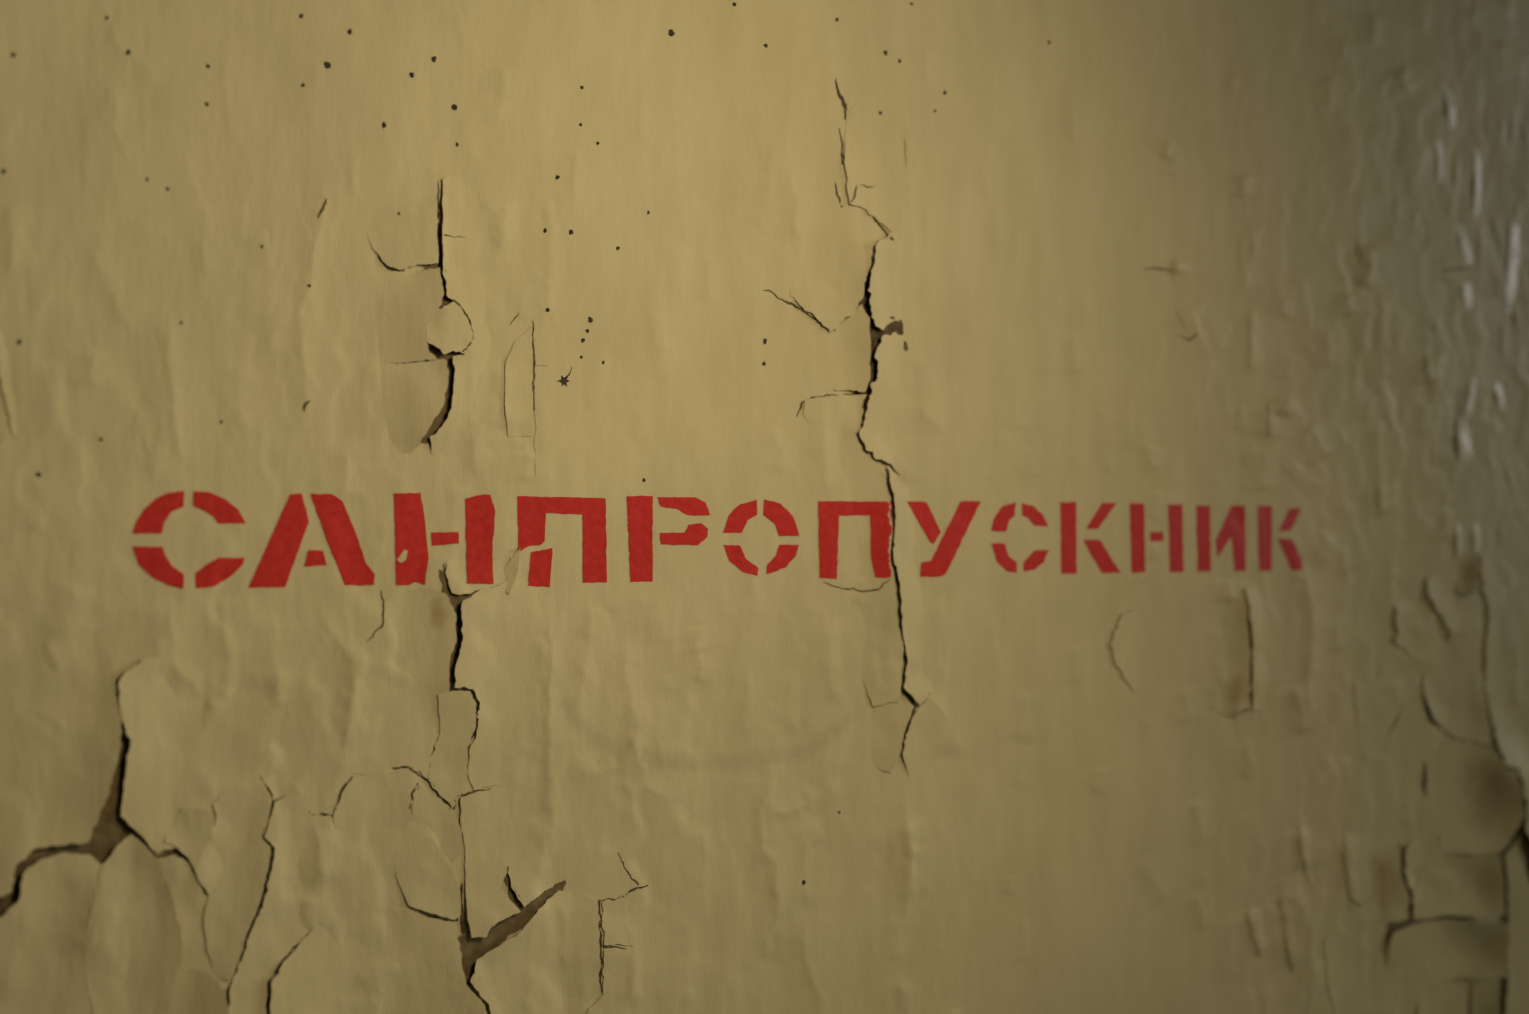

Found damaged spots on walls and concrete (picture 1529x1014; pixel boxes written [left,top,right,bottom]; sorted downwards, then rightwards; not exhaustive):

crack [835,78,894,241]
crack [377,234,462,306]
crack [763,290,829,331]
crack [883,316,909,351]
crack [797,392,864,417]
crack [823,579,890,593]
peeling [0,549,645,1014]
peeling [1344,553,1529,1014]